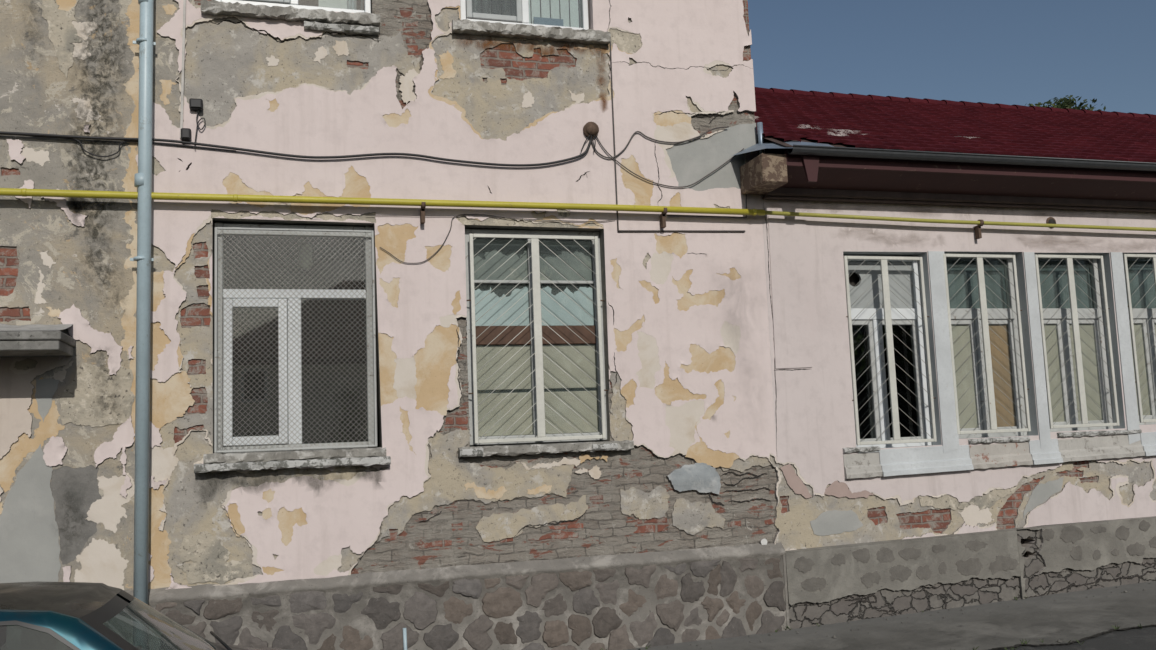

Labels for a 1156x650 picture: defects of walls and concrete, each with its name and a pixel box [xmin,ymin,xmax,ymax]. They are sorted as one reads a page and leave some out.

damp [75,0,118,284]
spalling [0,0,643,590]
peeling [639,232,741,311]
peeling [703,0,751,78]
spalling [314,290,1156,576]